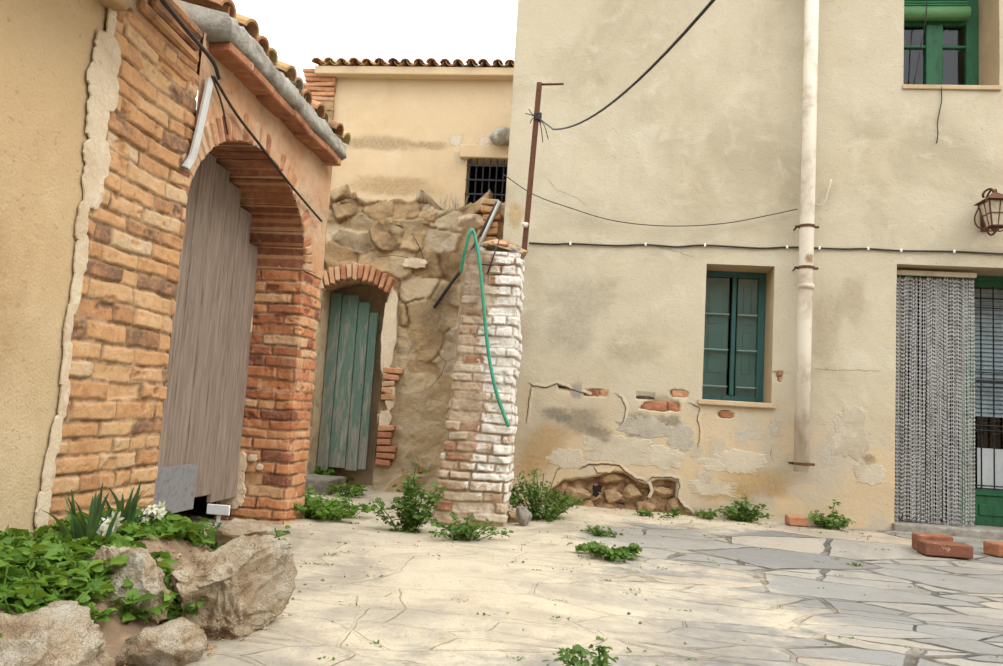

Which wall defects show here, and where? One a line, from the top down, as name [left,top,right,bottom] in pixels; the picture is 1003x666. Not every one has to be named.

crack [526,380,629,429]
flaking render [544,389,694,471]
crack [686,400,704,450]
spalling [718,411,734,419]
flaking render [687,449,768,498]